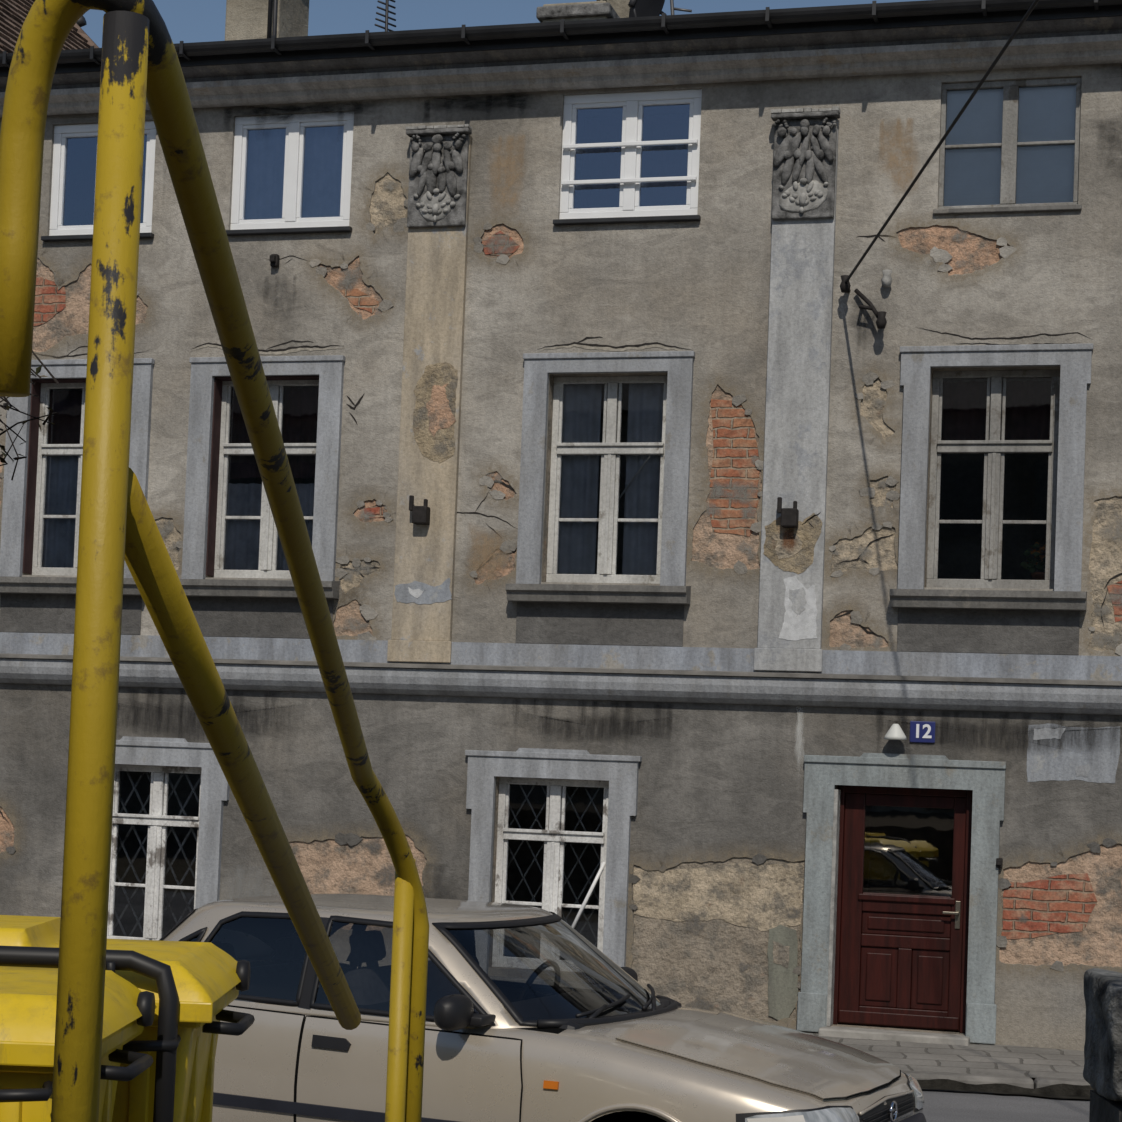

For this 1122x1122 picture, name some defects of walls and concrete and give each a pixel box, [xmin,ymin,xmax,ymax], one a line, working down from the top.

flaking render [32,241,92,355]
crack [192,343,222,351]
crack [258,340,342,355]
crack [537,336,691,352]
flaking render [894,221,1018,279]
peeling [413,362,458,463]
flaking render [687,383,900,651]
flaking render [1083,490,1122,656]
flaking render [289,832,395,896]
flaking render [403,830,430,886]
flaking render [628,852,805,1025]
flaking render [996,837,1122,972]